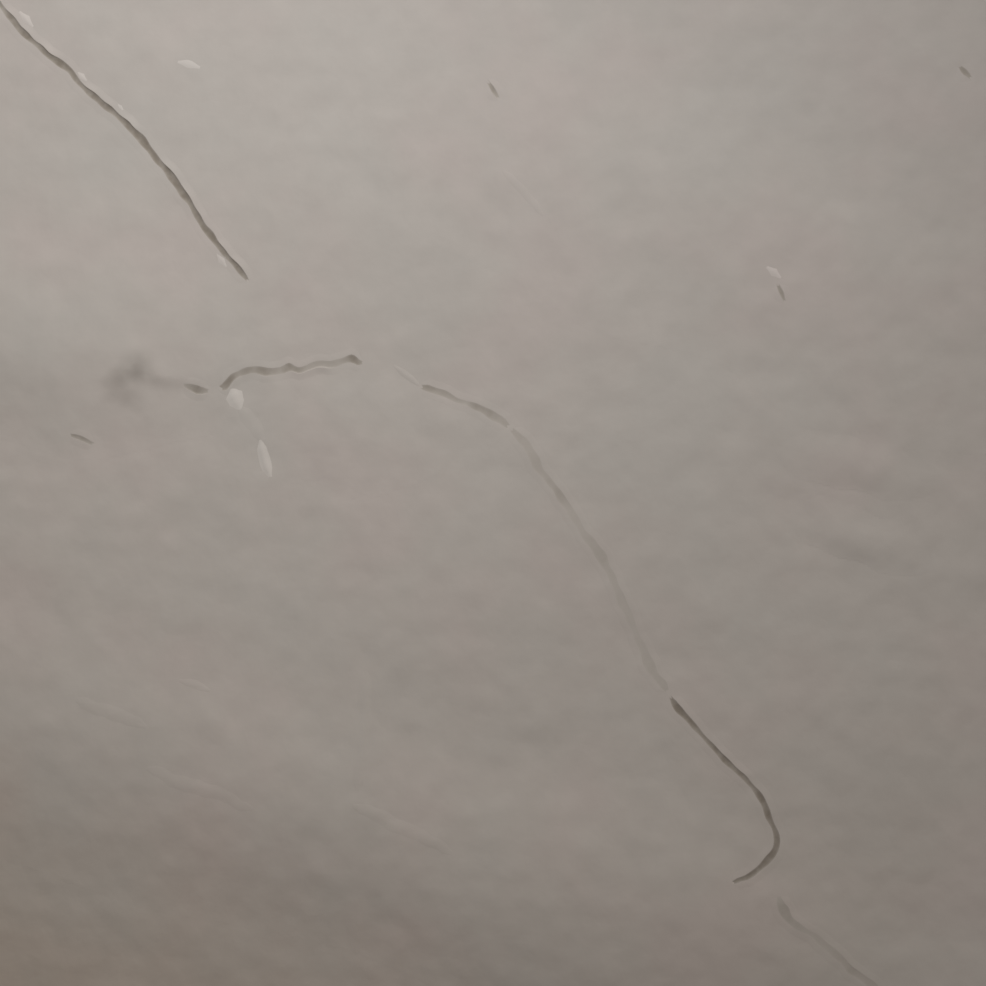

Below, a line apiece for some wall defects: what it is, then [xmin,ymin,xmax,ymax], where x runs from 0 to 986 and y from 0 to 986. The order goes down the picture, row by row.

crack [0,0,252,283]
crack [182,348,363,477]